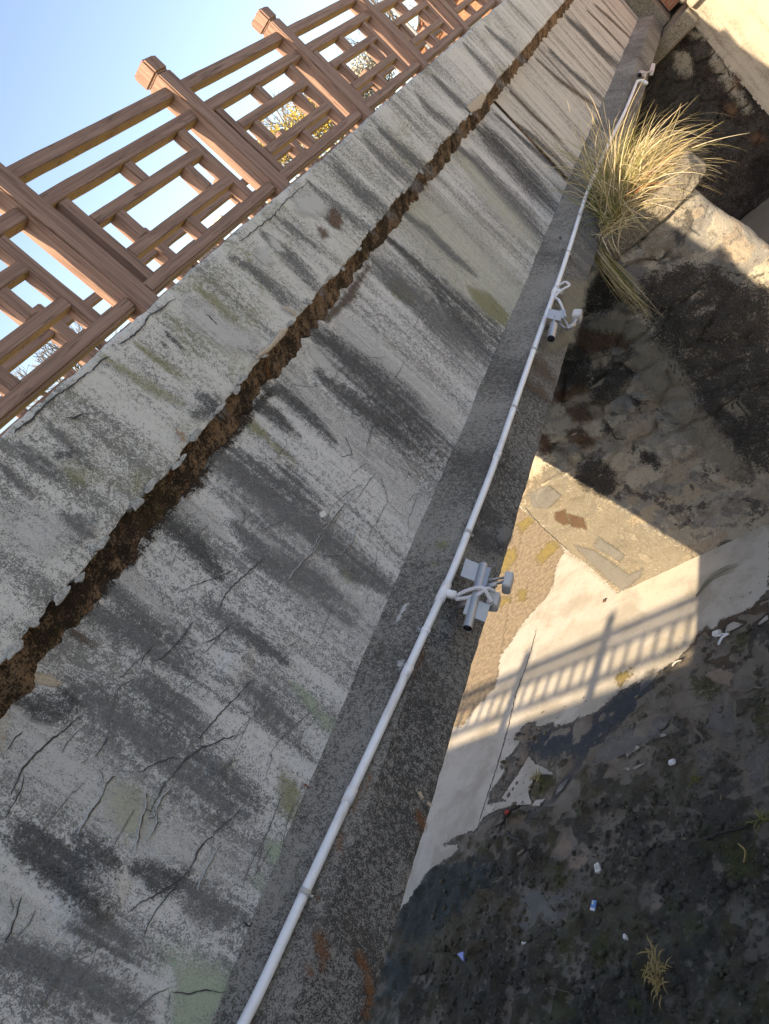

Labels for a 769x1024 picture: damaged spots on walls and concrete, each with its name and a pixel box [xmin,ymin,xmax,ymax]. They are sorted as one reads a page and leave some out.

crack [14,298,176,434]
crack [239,183,307,241]
damp [155,442,395,649]
damp [260,215,324,295]
crack [288,356,421,579]
damp [252,304,467,531]
damp [307,42,572,379]
damp [462,501,505,557]
peeling [575,531,652,590]
damp [0,567,269,1024]
crack [4,524,283,861]
damp [418,576,769,887]